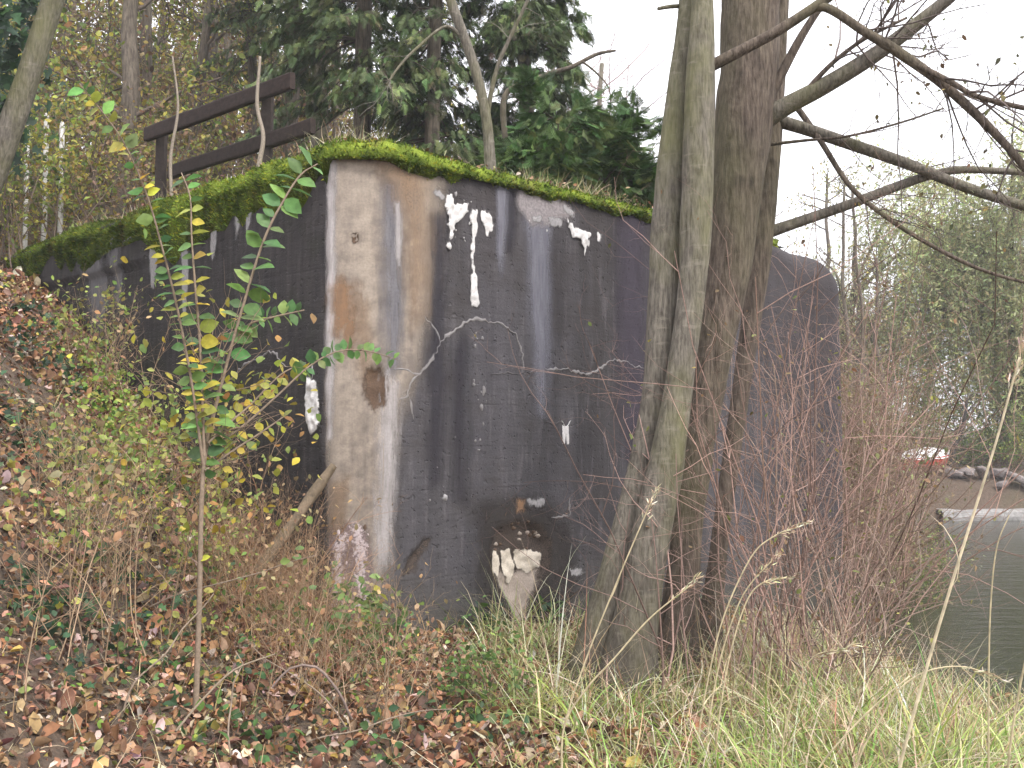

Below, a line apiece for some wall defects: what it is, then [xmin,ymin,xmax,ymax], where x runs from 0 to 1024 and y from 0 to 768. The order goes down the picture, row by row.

leakage [304,159,601,633]
crack [393,316,642,419]
spalling [489,498,571,624]